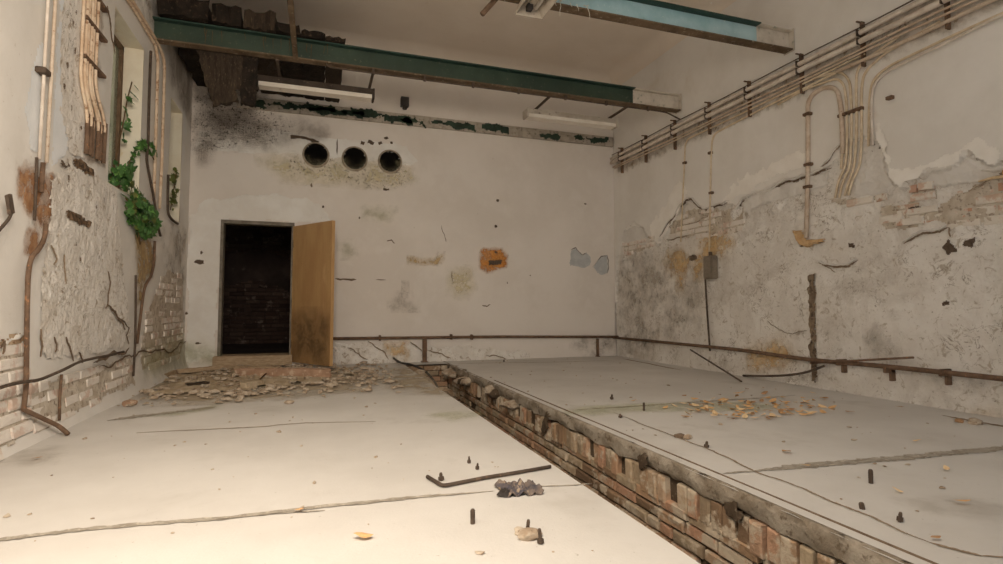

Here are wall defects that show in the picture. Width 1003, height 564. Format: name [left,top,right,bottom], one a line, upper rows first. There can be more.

peeling [254,100,509,134]
flaking render [0,0,185,461]
crack [40,271,186,368]
flaking render [570,123,1003,419]
crack [107,407,329,433]
crack [0,491,491,541]
crack [579,395,1003,558]